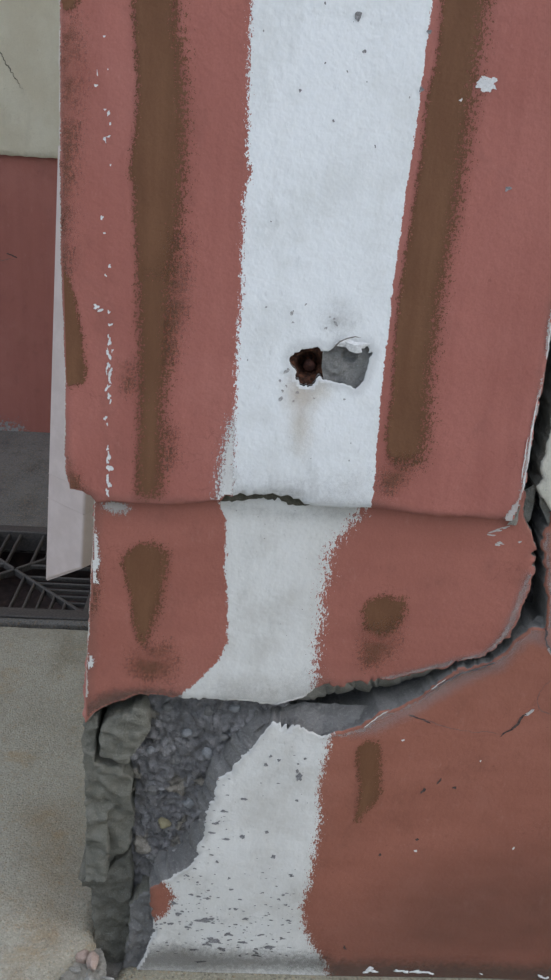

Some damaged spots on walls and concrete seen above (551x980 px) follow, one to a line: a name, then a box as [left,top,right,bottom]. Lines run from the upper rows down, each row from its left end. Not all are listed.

peeling [476,76,498,92]
spalling [278,336,372,402]
crack [505,309,551,654]
crack [252,630,550,737]
spalling [78,694,293,969]